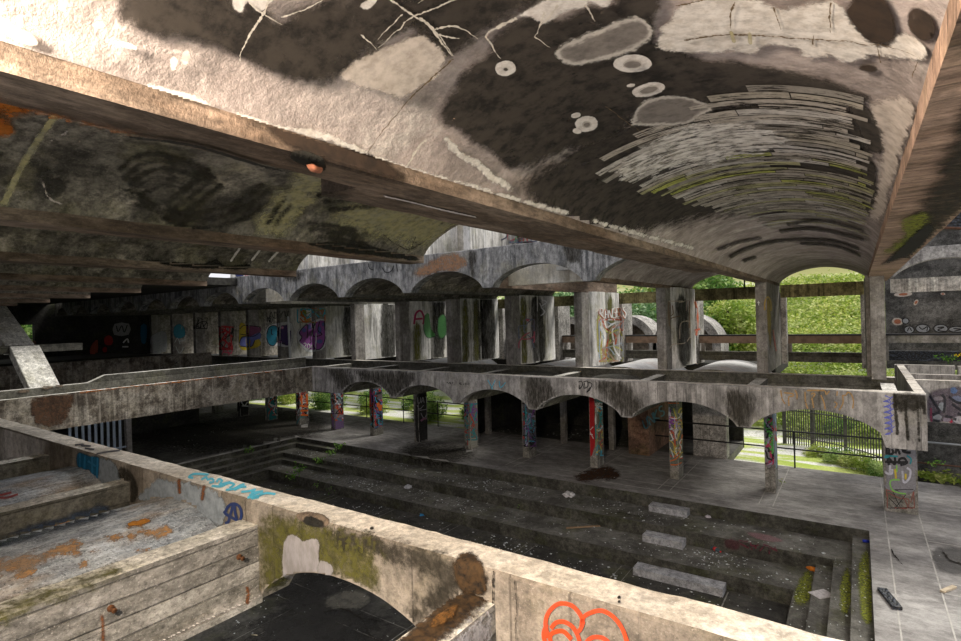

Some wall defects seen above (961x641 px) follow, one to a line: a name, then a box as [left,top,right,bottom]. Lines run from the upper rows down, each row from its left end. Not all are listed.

crack [684,2,923,77]
rust [0,103,30,137]
water stain [883,225,933,264]
rust [0,539,95,579]
rust [105,517,174,552]
water stain [163,573,389,641]
peeling [282,511,333,578]
water stain [336,529,463,622]